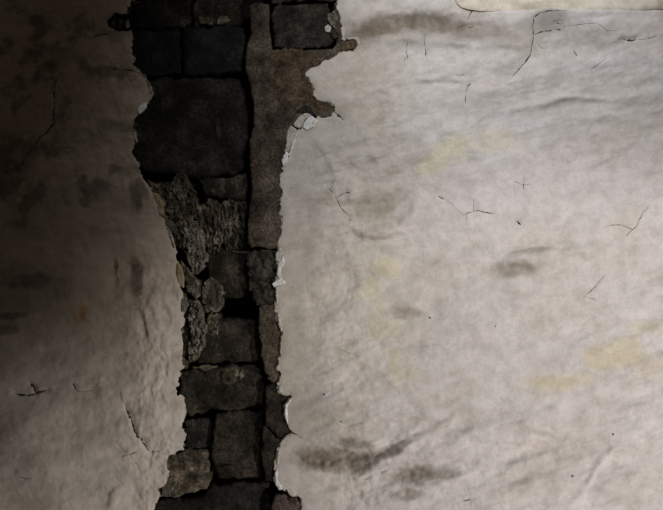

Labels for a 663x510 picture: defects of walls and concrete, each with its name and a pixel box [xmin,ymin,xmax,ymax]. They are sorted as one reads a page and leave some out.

water stain [344,4,525,44]
crack [510,10,654,80]
spalling [245,2,357,304]
flaking render [275,450,283,490]
water stain [279,435,396,478]
water stain [370,461,473,504]